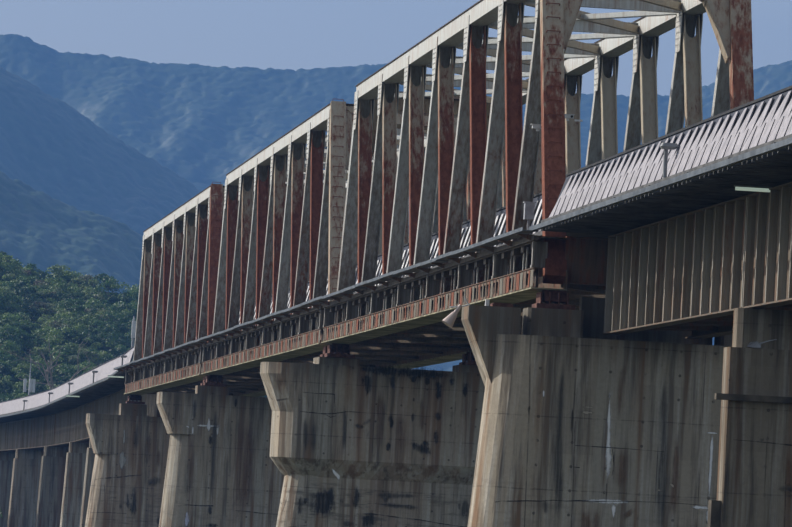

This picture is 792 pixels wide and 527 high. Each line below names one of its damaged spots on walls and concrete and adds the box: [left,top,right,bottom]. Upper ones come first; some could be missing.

damp [361,365,453,399]
damp [555,377,573,499]
damp [708,432,717,493]
damp [298,488,334,515]